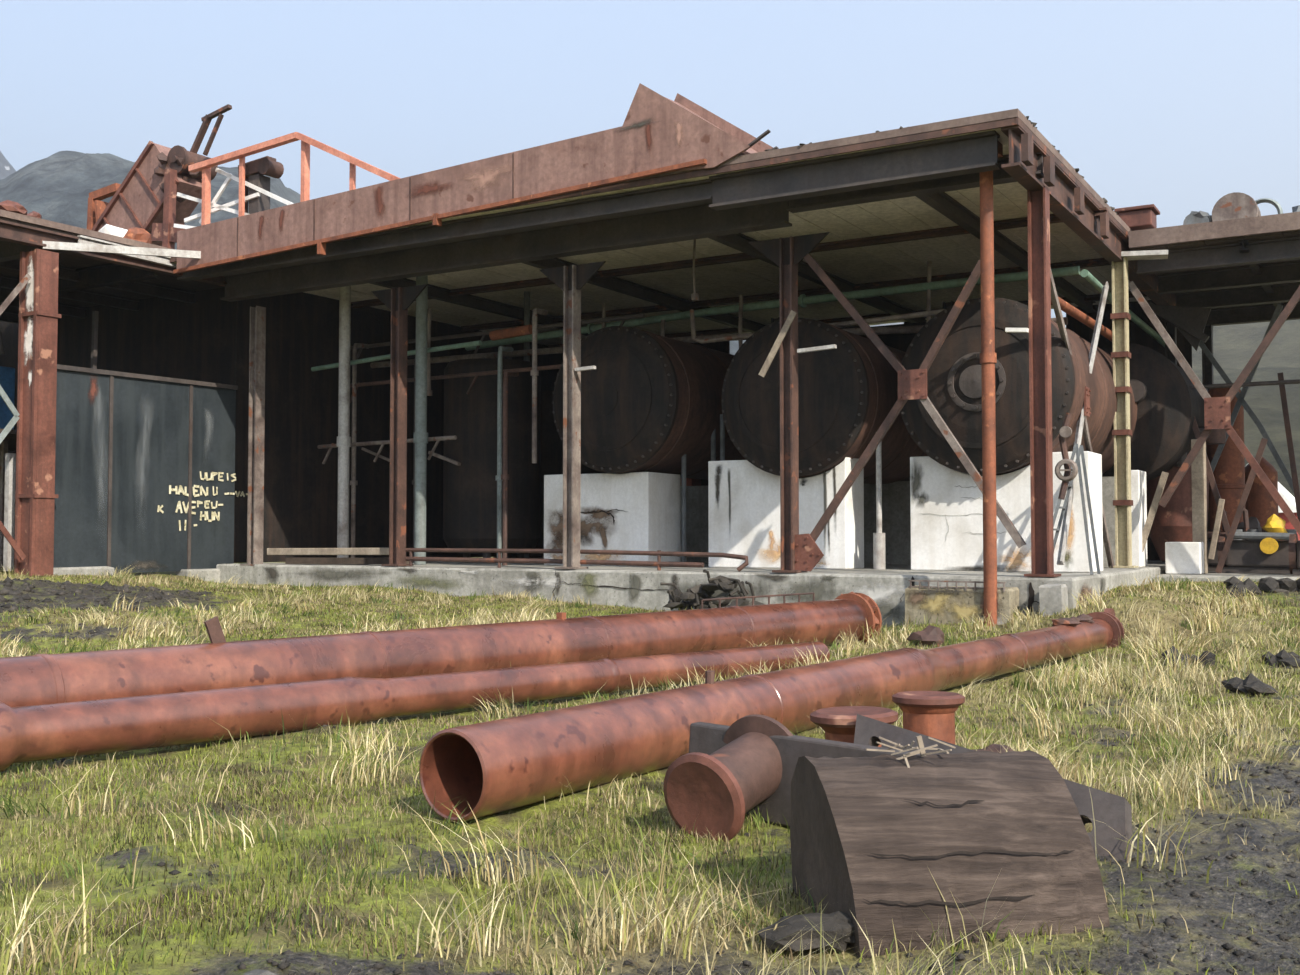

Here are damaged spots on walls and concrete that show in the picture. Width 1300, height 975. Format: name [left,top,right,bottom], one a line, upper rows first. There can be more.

damp [715,466,731,522]